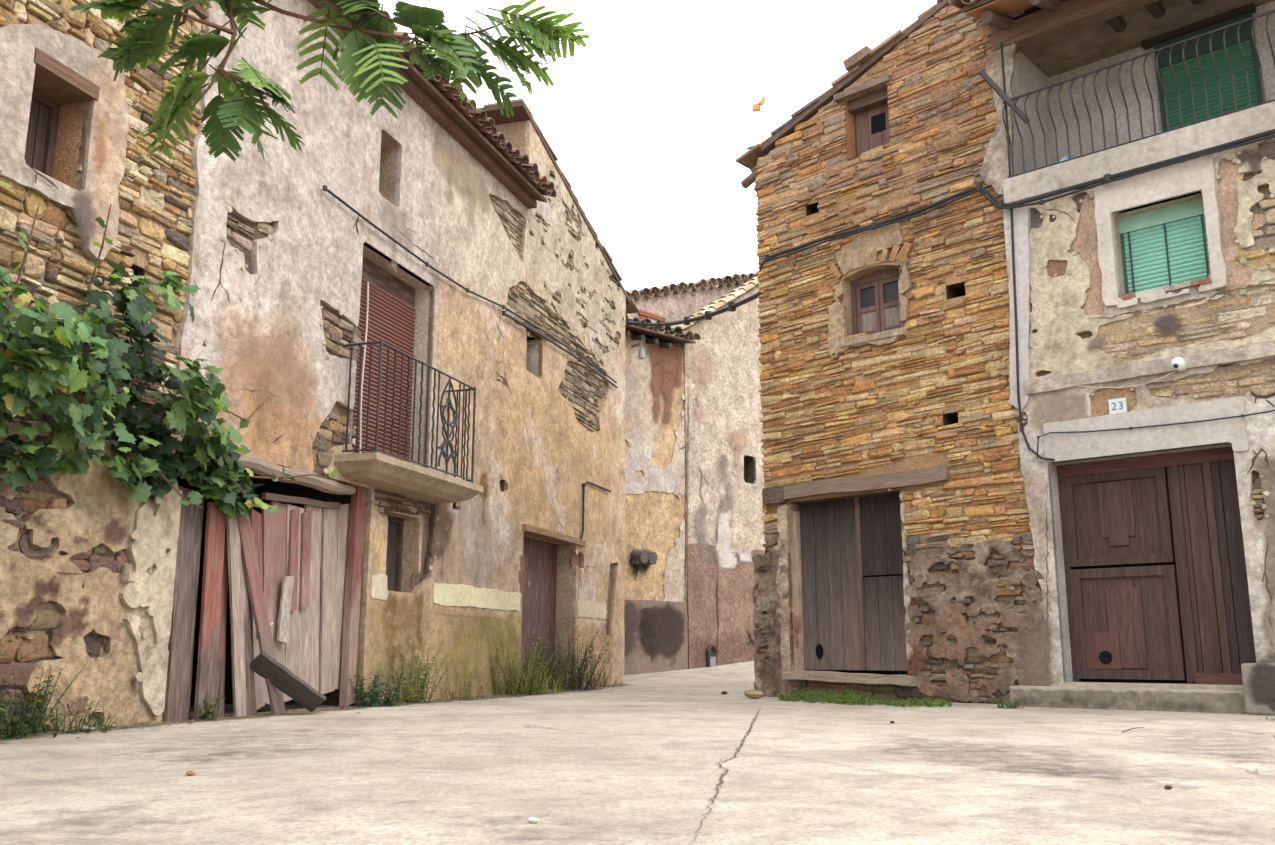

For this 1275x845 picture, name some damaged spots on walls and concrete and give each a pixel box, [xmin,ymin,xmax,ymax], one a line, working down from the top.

spalling [1031,208,1057,229]
spalling [1042,138,1275,362]
spalling [505,280,610,434]
peeling [119,486,182,716]
damp [624,602,684,659]